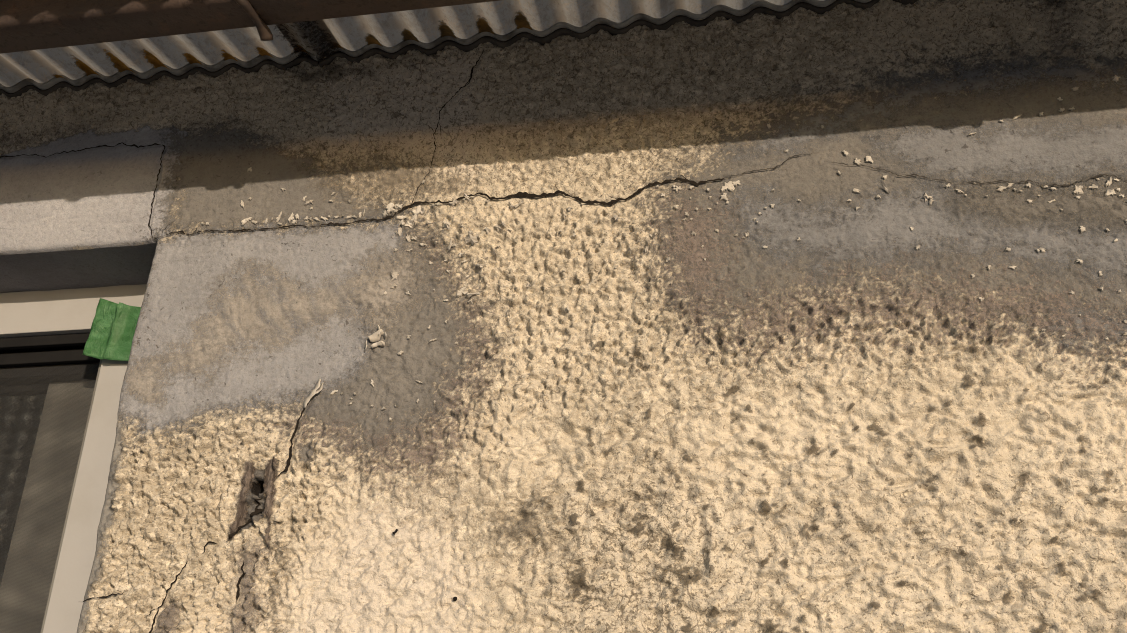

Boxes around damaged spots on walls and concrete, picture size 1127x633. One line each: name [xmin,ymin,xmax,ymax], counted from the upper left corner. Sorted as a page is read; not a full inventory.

leakage [302,143,484,207]
crack [0,50,1127,240]
leakage [637,182,1127,403]
leakage [273,239,503,489]
crack [276,401,310,478]
leakage [854,419,889,436]
leakage [971,413,986,448]
hole [226,457,282,553]
leakage [1091,470,1117,502]
crack [147,541,217,633]
crack [236,560,245,600]